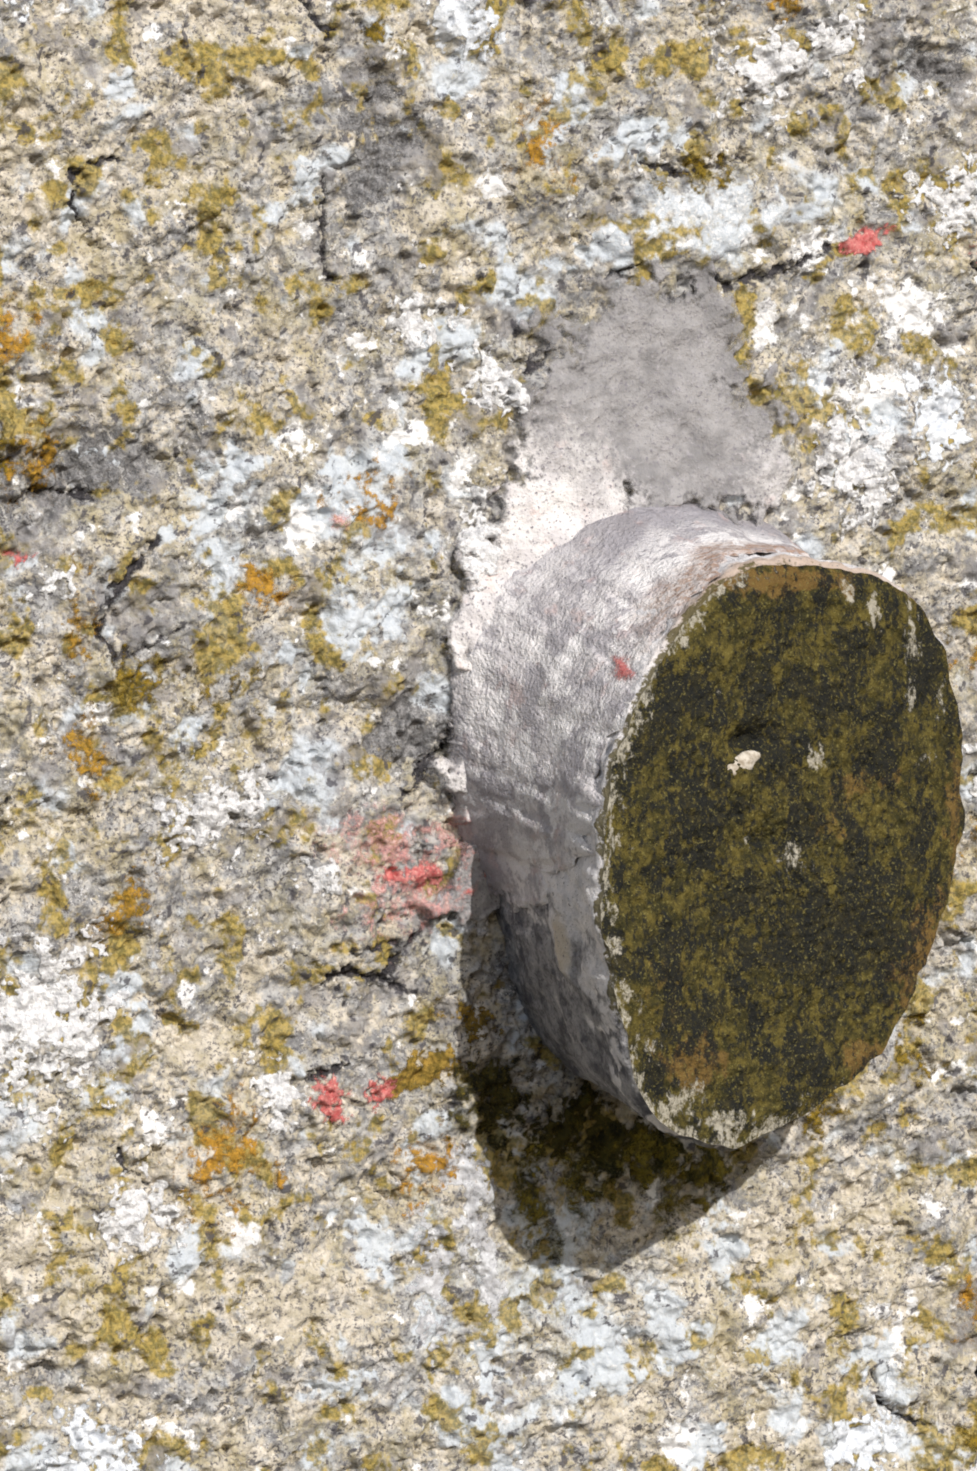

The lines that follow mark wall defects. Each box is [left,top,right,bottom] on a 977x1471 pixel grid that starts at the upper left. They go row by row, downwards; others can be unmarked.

crack [298,0,336,41]
crack [313,175,334,282]
crack [92,534,179,663]
water stain [386,997,755,1368]